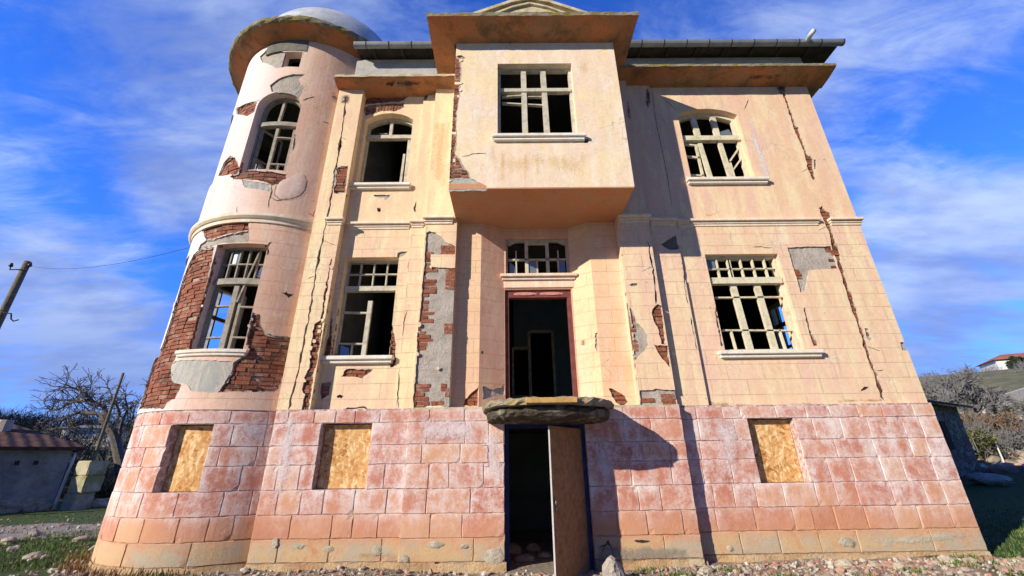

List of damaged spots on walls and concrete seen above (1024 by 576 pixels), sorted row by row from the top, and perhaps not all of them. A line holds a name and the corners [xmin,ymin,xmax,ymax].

spalling [237,103,256,116]
spalling [219,156,286,186]
peeling [261,52,304,98]
spalling [449,56,471,180]
crack [782,93,815,175]
spalling [138,223,249,411]
spalling [219,313,290,394]
peeling [413,232,455,408]
peeling [625,284,676,405]
peeling [788,247,837,292]
crack [821,215,884,400]